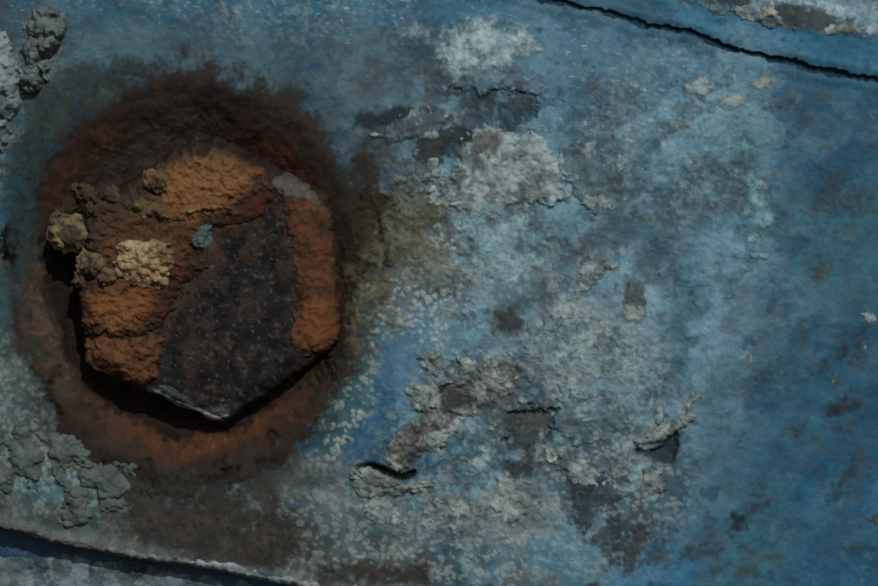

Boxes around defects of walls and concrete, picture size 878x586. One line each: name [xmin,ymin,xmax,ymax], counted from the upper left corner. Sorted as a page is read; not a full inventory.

crack [538,0,878,83]
peeling [685,0,878,36]
corrosion [7,60,476,569]
peeling [355,86,666,479]
peeling [634,392,703,495]
corrosion [317,558,432,585]
peeling [561,476,650,572]